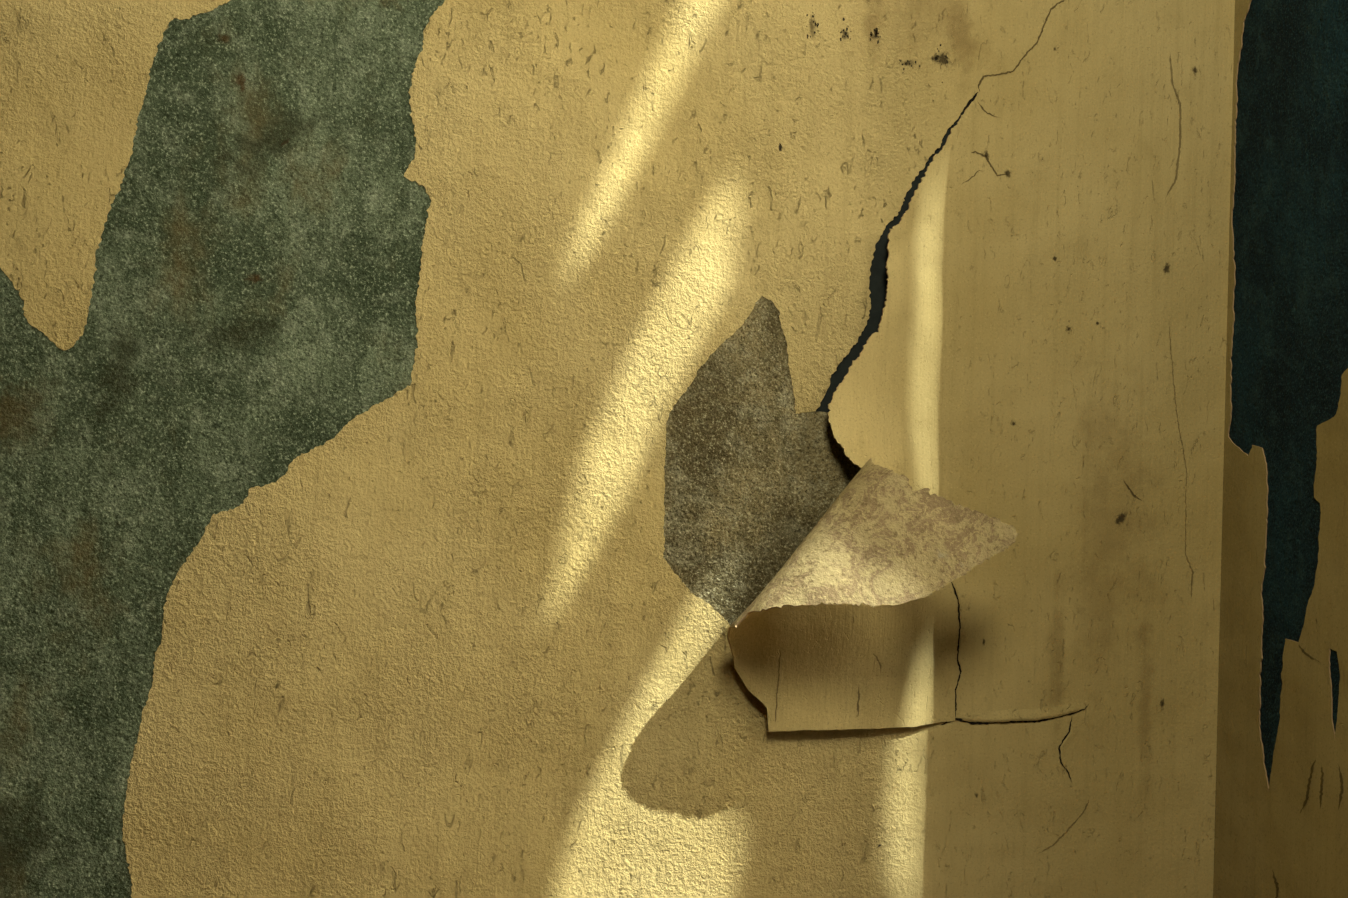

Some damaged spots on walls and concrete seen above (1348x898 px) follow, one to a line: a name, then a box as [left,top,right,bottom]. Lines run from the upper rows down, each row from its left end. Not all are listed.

peeling [0,0,445,898]
peeling [663,97,1018,732]
crack [814,0,1064,412]
crack [941,577,1089,782]
peeling [1229,0,1348,784]